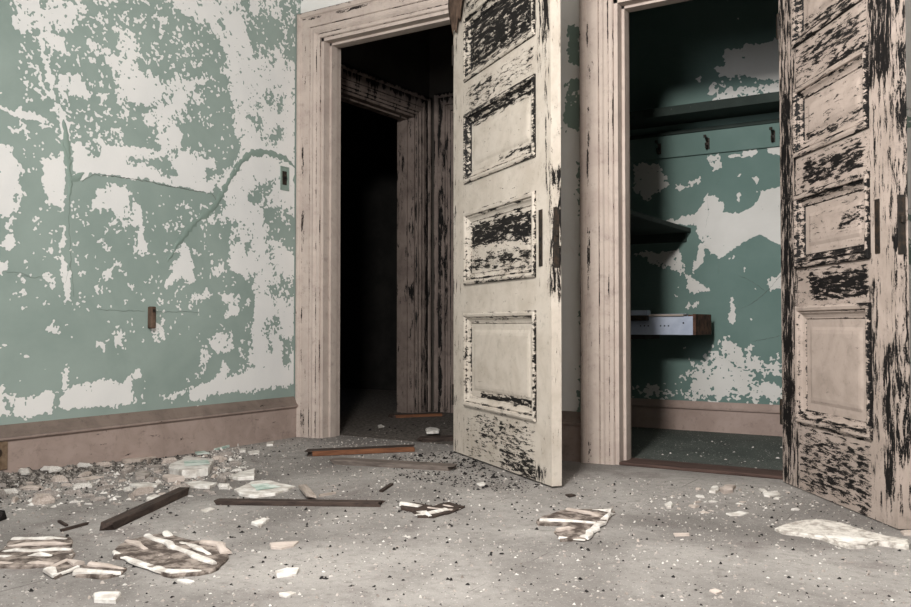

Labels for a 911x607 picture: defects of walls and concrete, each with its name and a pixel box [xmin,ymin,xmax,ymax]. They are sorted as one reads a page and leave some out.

crack [61,119,296,296]
peeling [633,162,701,201]
peeling [707,147,780,172]
peeling [634,176,781,309]
peeling [728,297,736,324]
peeling [0,363,146,421]
peeling [632,335,782,405]